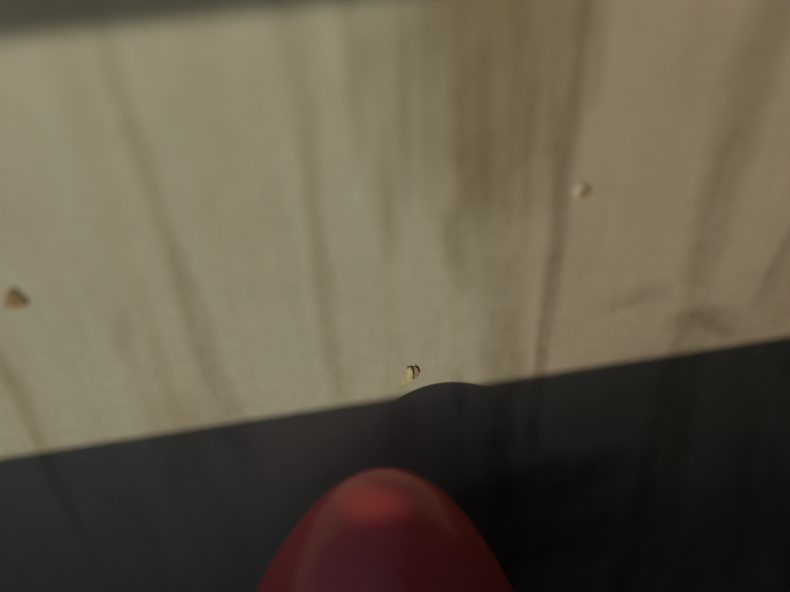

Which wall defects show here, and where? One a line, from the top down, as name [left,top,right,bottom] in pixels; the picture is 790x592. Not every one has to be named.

peeling [4,288,26,309]